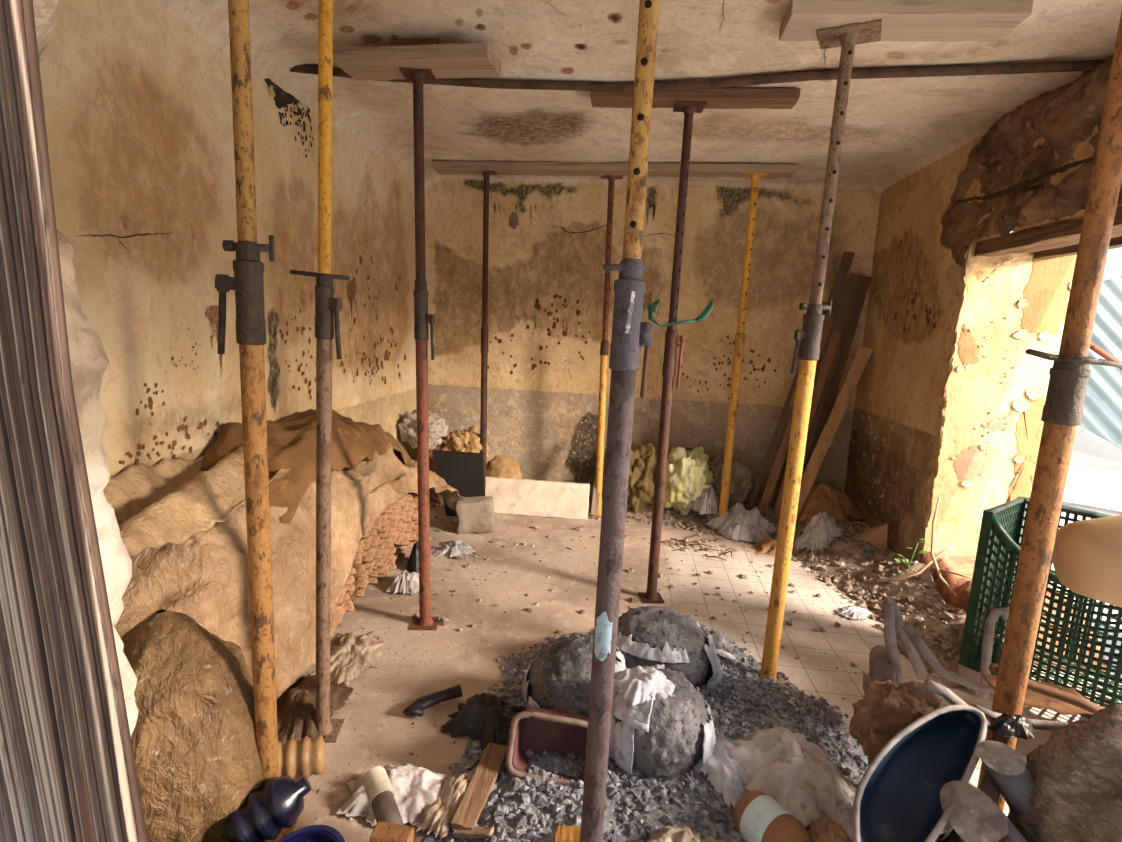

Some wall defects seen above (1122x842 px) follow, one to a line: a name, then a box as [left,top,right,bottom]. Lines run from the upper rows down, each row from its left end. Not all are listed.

spalling [264,78,309,109]
leakage [472,111,583,146]
leakage [464,179,576,219]
leakage [716,186,809,215]
crack [77,233,172,247]
peeling [924,54,1114,528]